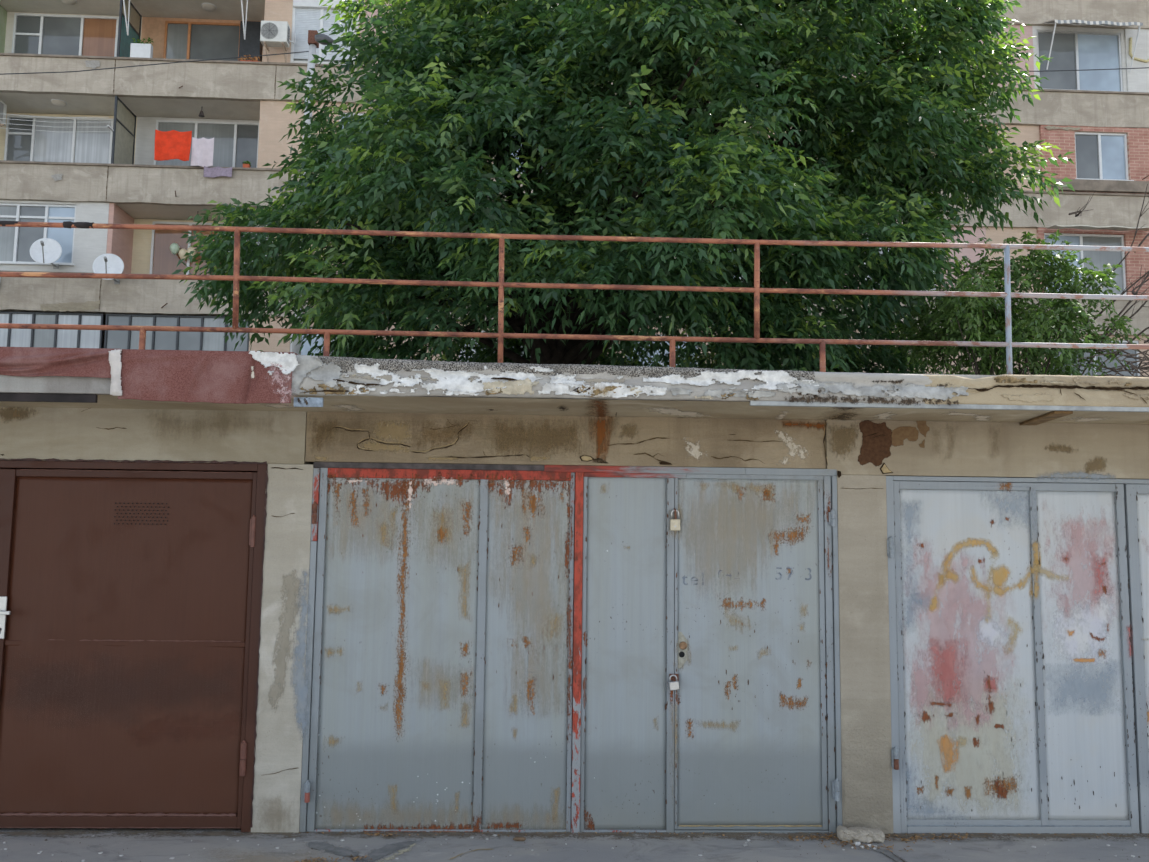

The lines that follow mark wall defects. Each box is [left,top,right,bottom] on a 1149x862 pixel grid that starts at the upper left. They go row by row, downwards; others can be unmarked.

peeling [249,351,969,411]
crack [327,419,529,458]
rust [591,387,612,460]
crack [609,437,670,462]
crack [711,434,781,464]
flaking render [858,420,929,474]
rust [768,515,809,556]
rust [321,473,573,736]
rust [550,597,587,727]
rust [780,678,808,709]
rust [916,675,1017,799]
rust [363,816,521,833]